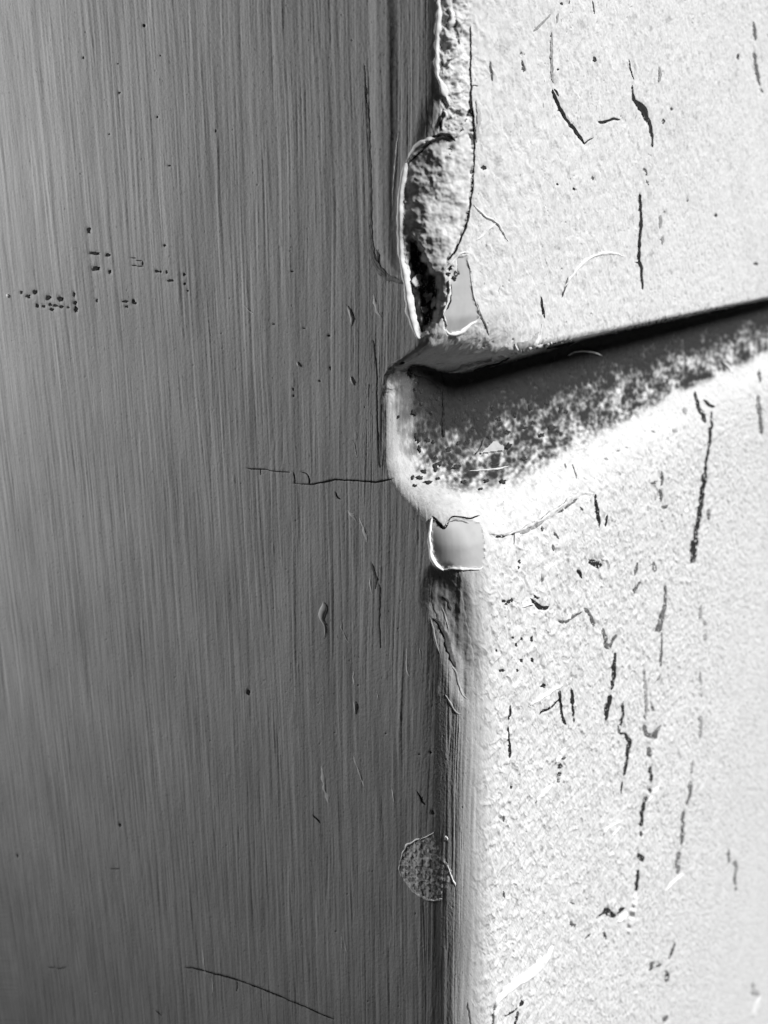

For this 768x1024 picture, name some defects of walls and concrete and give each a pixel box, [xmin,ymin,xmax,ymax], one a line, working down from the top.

spalling [396,0,489,339]
crack [521,0,664,290]
crack [248,341,391,499]
crack [651,391,715,563]
spalling [428,491,594,714]
crack [698,605,707,641]
crack [530,559,668,940]
crack [675,672,703,874]
crack [185,967,333,1019]